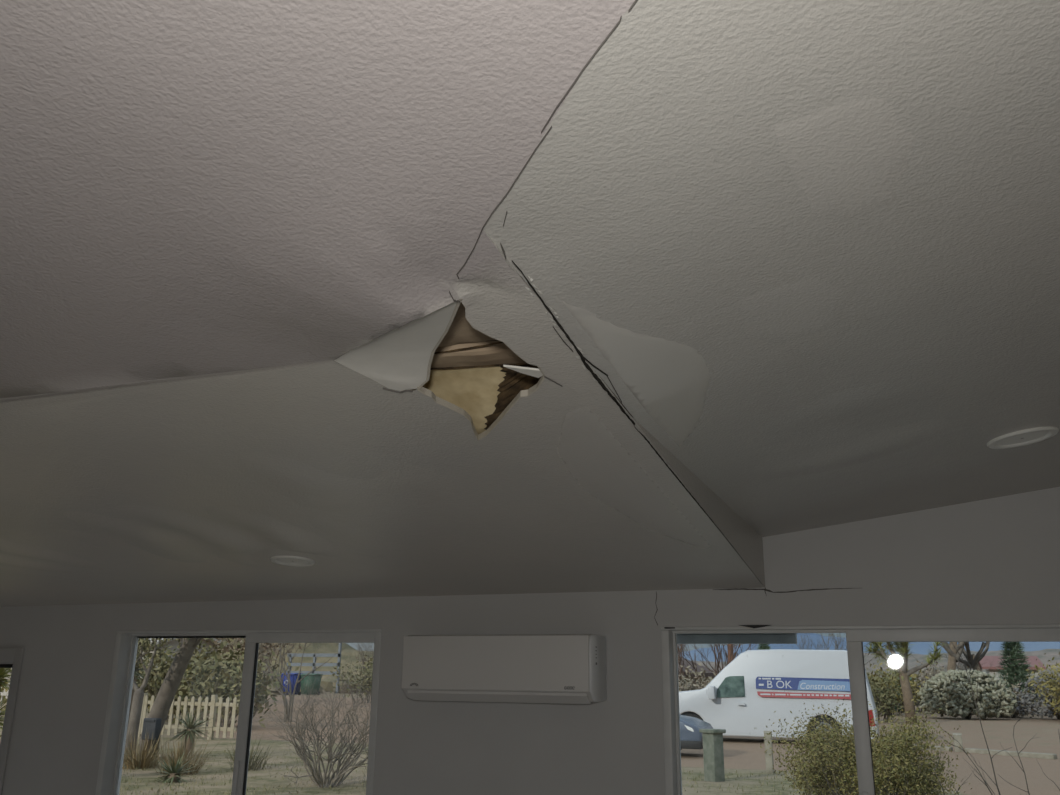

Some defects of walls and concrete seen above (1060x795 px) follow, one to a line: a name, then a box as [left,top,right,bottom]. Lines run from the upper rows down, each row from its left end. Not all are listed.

crack [449,0,851,596]